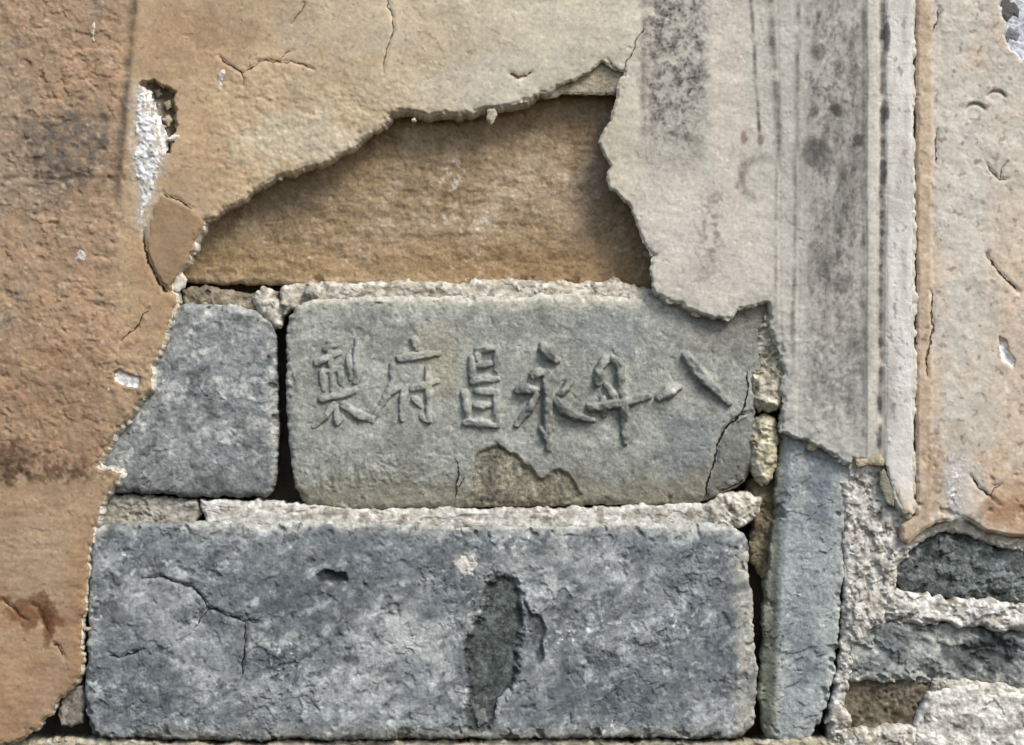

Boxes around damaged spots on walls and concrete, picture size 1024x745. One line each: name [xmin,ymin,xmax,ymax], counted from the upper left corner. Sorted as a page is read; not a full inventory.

crack [221,51,315,84]
water stain [650,0,703,138]
water stain [814,61,866,116]
water stain [810,123,866,287]
flaking render [4,62,624,745]
crack [704,372,749,498]
flaking render [651,289,910,519]
crack [109,649,142,658]
crack [146,576,258,674]